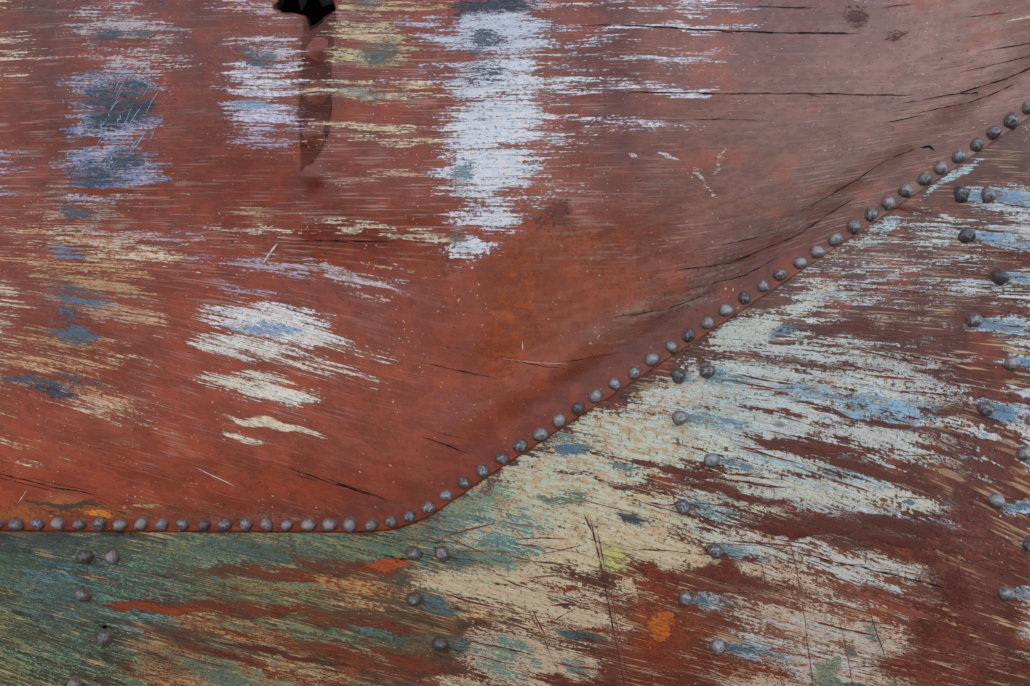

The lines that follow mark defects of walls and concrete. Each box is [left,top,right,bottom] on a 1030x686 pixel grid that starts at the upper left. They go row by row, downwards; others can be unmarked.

peeling [0,0,767,435]
peeling [0,158,1030,686]